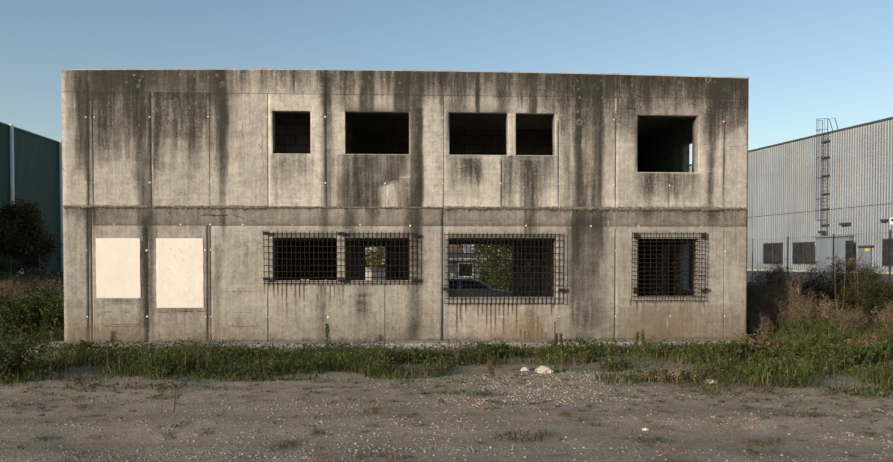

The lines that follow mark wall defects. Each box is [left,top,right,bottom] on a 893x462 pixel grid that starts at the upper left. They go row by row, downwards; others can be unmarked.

damp [71,70,246,326]
corrosion [477,304,555,336]
damp [320,70,748,325]